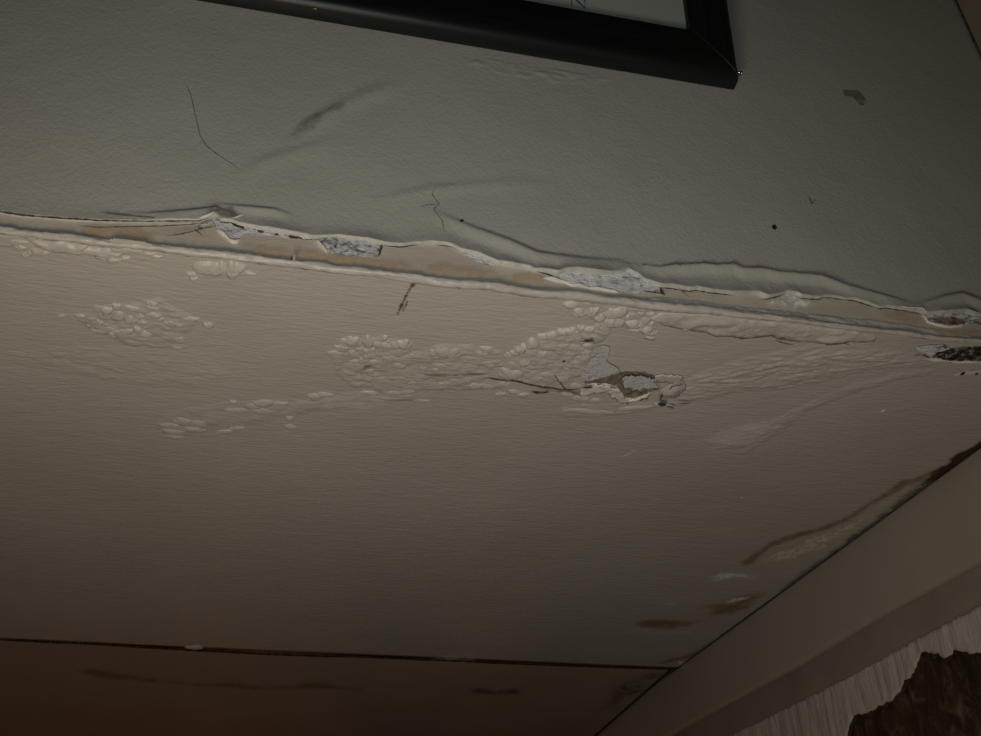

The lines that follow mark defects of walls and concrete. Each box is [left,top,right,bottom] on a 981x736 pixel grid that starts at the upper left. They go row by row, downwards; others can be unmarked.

crack [187,87,237,168]
crack [0,211,315,240]
peeling [195,220,381,259]
crack [379,244,414,256]
crack [421,189,460,252]
peeling [538,270,665,295]
crack [642,262,734,296]
crack [762,273,926,315]
peeling [922,304,981,328]
peeling [914,345,981,376]
damp [714,442,981,592]